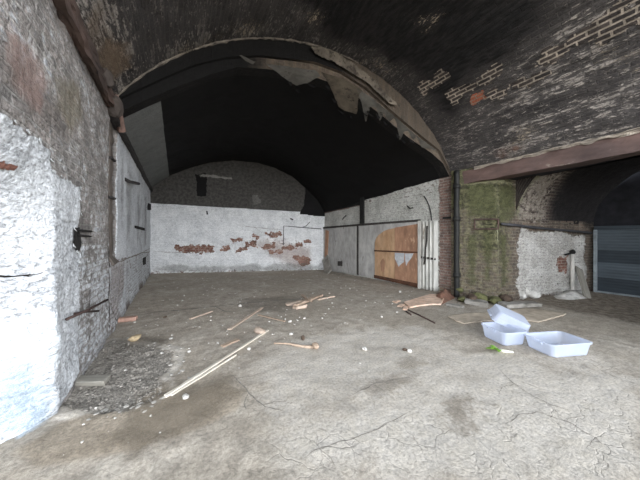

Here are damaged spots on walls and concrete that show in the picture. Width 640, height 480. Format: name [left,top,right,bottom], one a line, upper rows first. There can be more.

spalling [445,0,640,106]
peeling [267,46,436,150]
spalling [417,69,451,96]
spalling [0,161,18,171]
crack [0,271,43,279]
flaking render [174,231,312,266]
spalling [556,255,568,274]
crack [230,374,286,411]
crack [498,372,608,449]
crack [299,412,408,464]